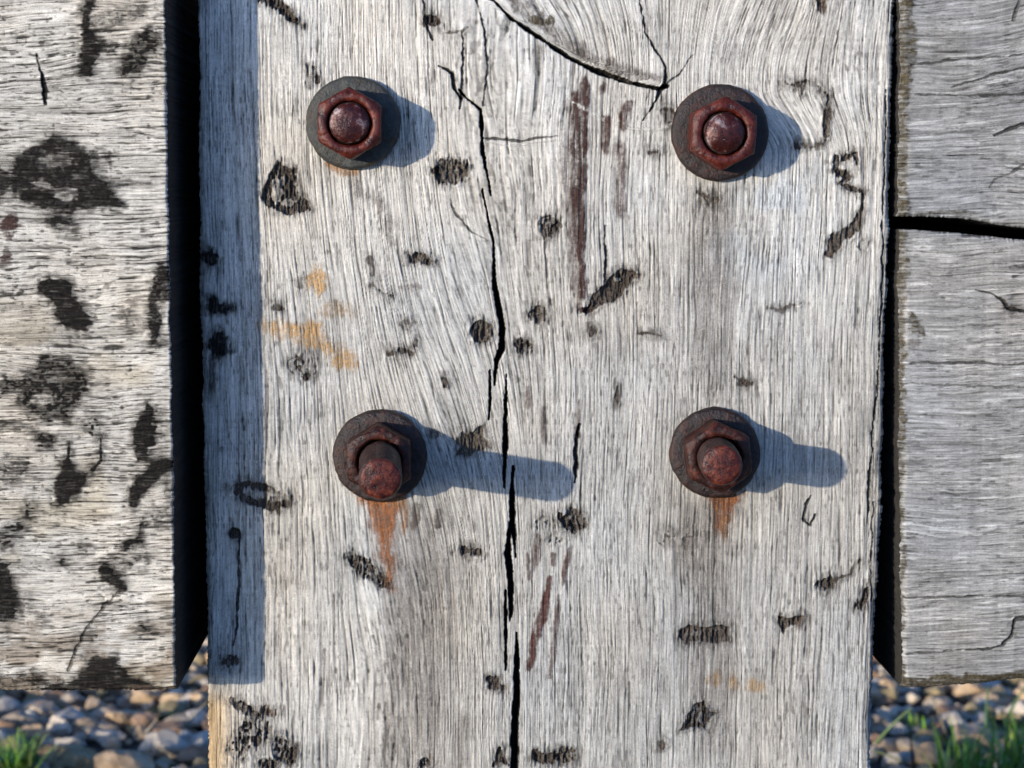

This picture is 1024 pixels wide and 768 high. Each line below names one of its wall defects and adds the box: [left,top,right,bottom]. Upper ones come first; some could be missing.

crack [439,0,679,768]
rust [360,497,408,590]
rust [710,494,738,534]